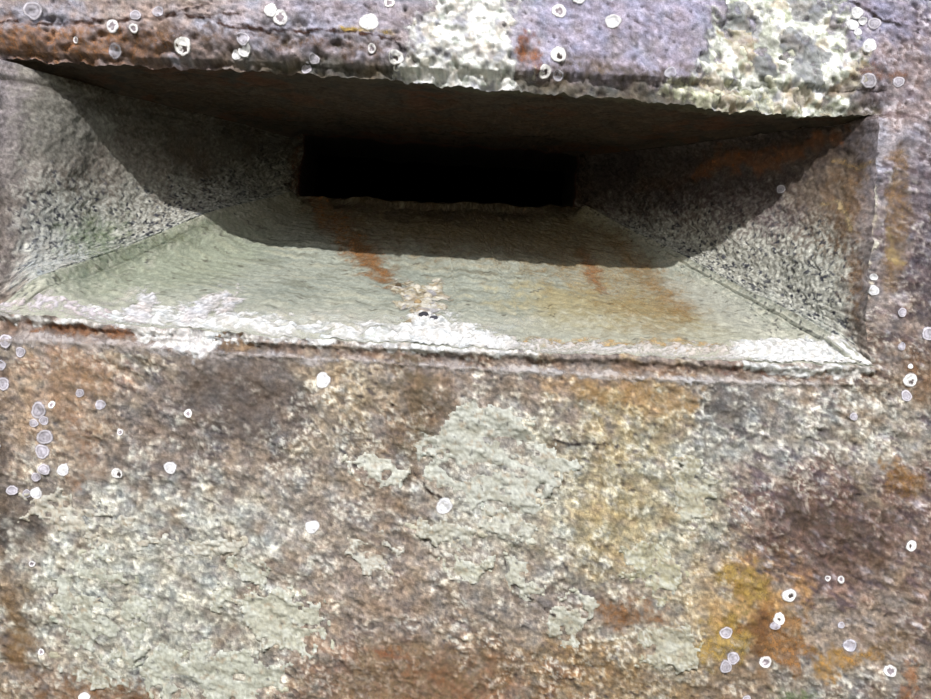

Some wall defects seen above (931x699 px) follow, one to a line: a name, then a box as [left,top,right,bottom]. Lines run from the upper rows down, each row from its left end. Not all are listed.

corrosion [0,22,182,67]
corrosion [306,196,392,288]
water stain [0,283,874,437]
corrosion [696,565,874,684]